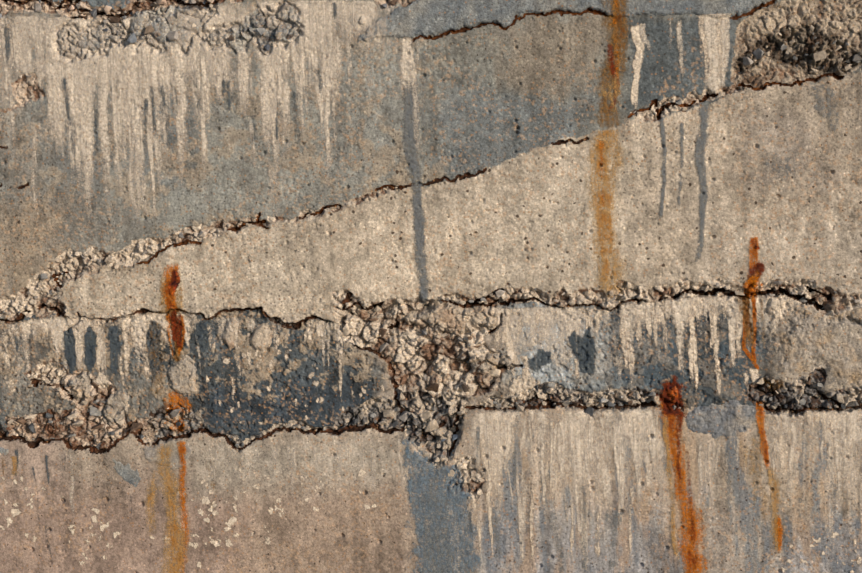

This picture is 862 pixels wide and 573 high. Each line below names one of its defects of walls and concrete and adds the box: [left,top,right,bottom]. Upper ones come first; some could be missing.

crack [2,0,219,56]
spalling [0,0,302,58]
crack [411,8,612,43]
spalling [357,0,862,123]
leakage [0,0,429,310]
corrosion [156,265,186,362]
spalling [0,277,862,504]
crack [441,286,832,334]
leakage [494,295,794,401]
corrosion [737,237,765,369]
leakage [397,408,667,573]
corrosion [656,376,708,573]